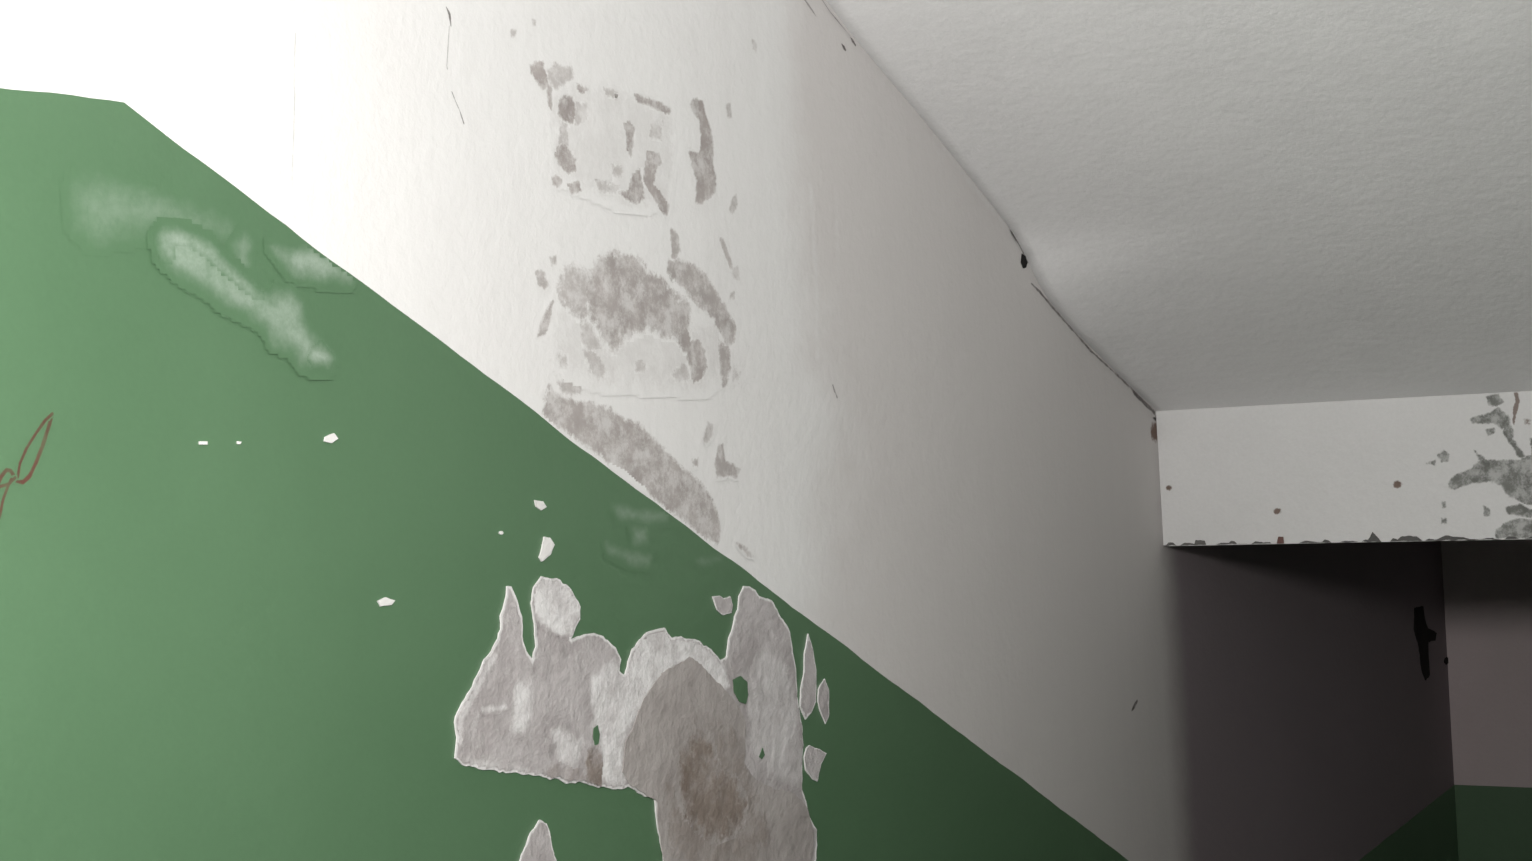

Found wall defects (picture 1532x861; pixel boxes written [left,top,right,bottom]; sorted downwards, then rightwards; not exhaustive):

peeling [528,57,739,219]
leakage [60,157,359,380]
peeling [716,233,741,303]
peeling [539,376,756,560]
peeling [1163,392,1532,546]
peeling [454,537,829,861]